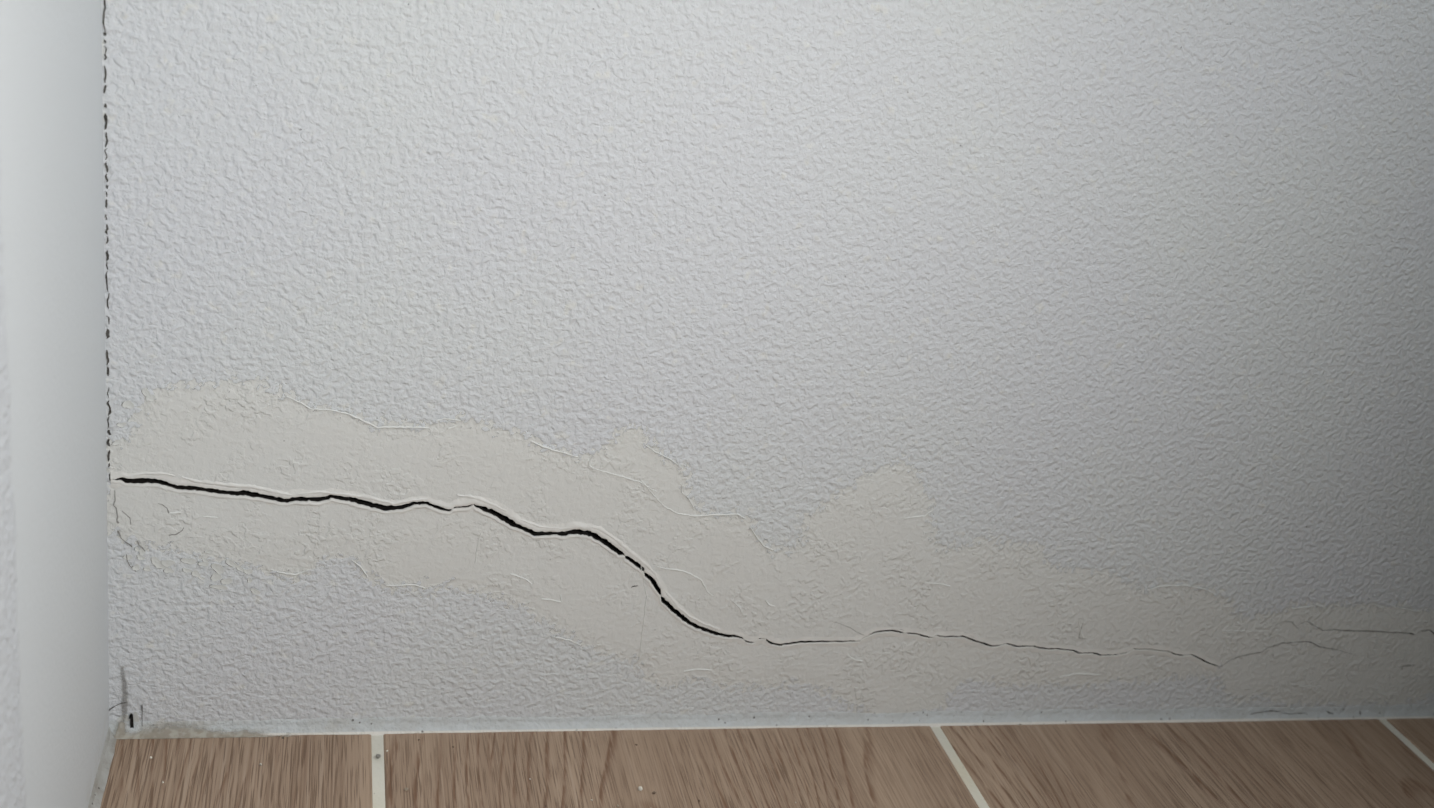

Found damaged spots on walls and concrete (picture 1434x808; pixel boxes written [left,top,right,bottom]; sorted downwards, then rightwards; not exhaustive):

crack [102,0,1434,672]